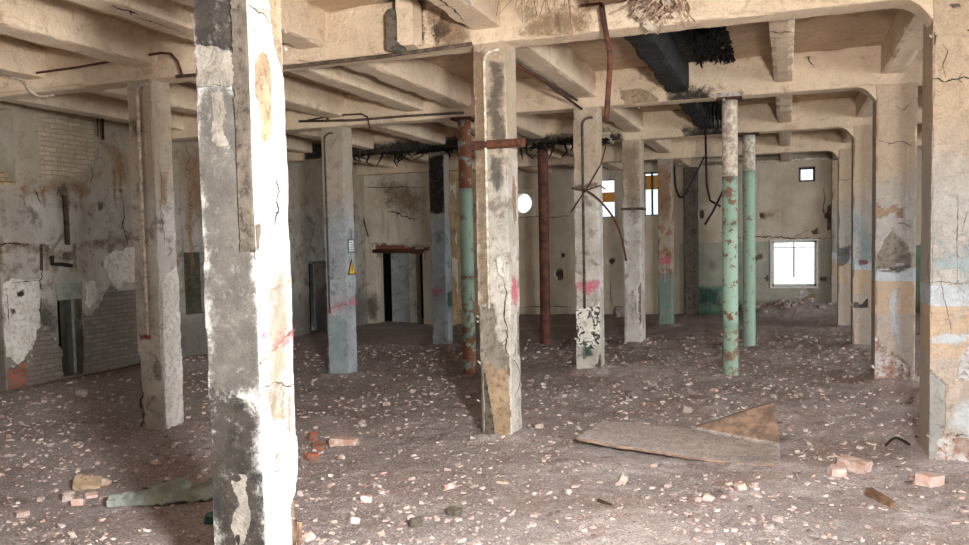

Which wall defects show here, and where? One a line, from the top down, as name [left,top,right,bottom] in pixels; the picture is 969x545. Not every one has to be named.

flaking render [254,0,287,142]
crack [933,46,969,83]
flaking render [876,198,914,273]
crack [0,242,44,326]
flaking render [7,328,64,391]
flaking render [871,338,909,380]
flaking render [927,345,969,462]